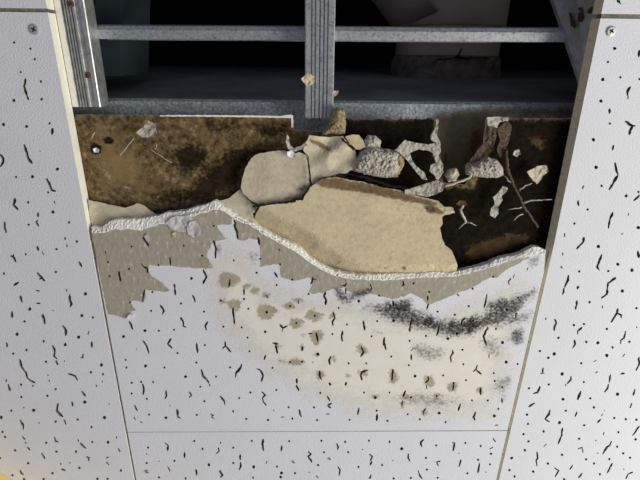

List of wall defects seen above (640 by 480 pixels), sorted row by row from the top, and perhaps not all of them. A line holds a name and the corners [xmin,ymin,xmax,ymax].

rust [569,6,594,29]
leakage [157,121,291,206]
spalling [160,115,294,128]
crack [252,154,311,219]
leakage [317,107,571,268]
peeling [91,199,546,320]
leakage [200,245,536,419]